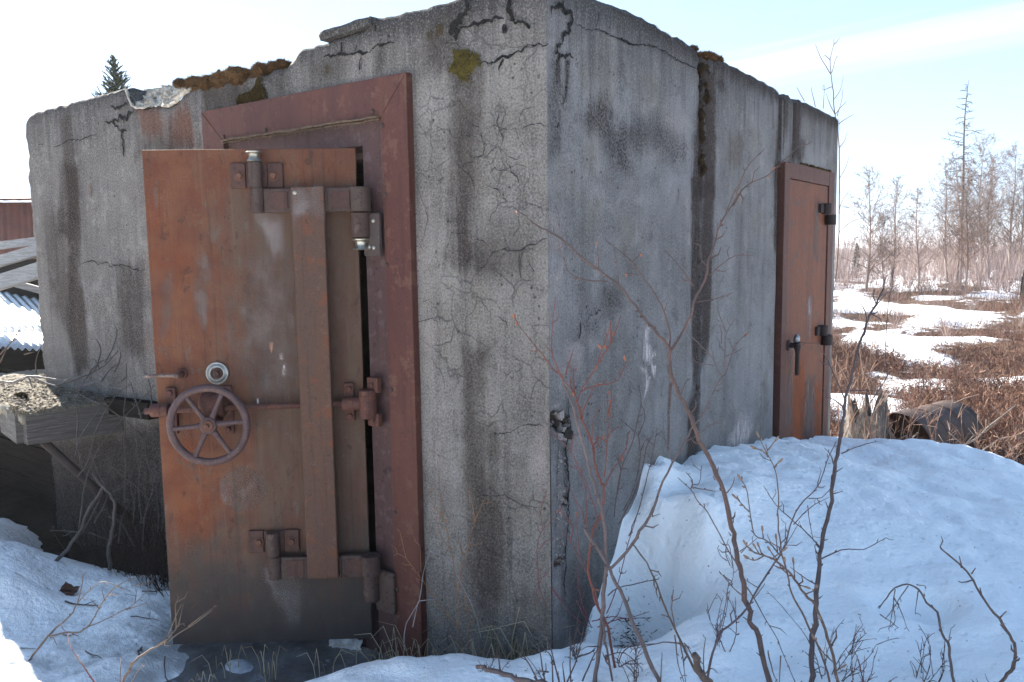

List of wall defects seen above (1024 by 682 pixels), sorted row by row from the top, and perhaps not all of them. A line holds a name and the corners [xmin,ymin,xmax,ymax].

crack [324,25,394,70]
crack [481,1,698,70]
crack [38,102,134,155]
spalling [125,83,192,109]
crack [414,97,560,281]
leakage [66,165,87,372]
crack [83,260,138,286]
leakage [587,63,839,458]
spalling [550,410,574,567]